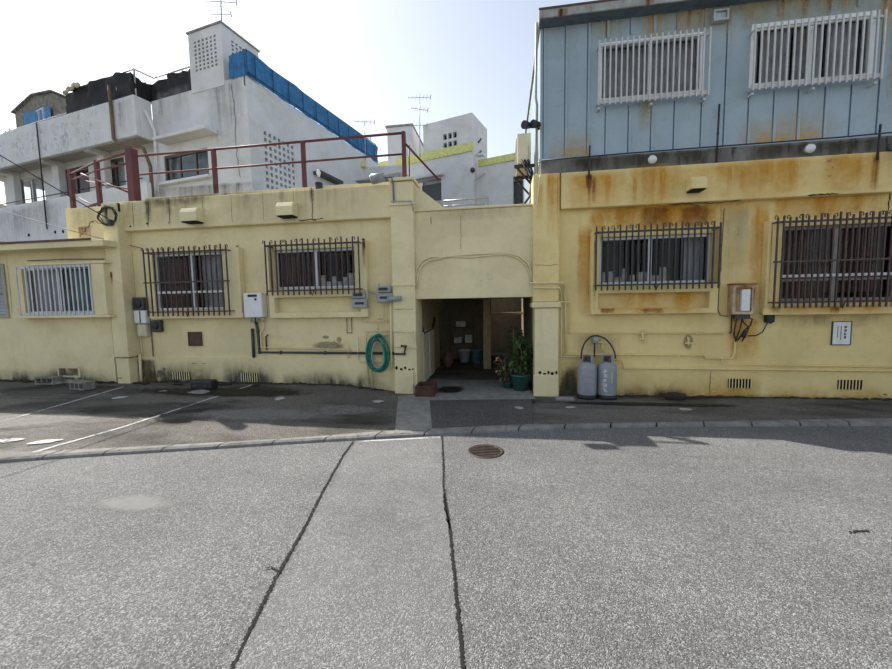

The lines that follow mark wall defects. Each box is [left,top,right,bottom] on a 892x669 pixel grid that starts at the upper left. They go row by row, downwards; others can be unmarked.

rust [576,175,609,192]
water stain [139,361,205,382]